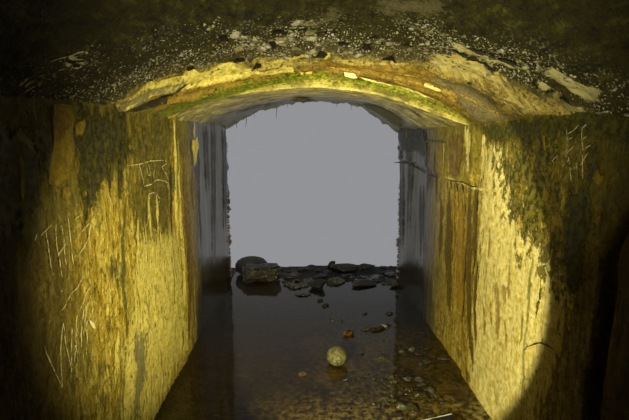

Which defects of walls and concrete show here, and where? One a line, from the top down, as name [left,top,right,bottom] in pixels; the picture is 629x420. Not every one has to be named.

peeling [29,17,629,201]
damp [361,77,441,102]
damp [192,121,216,258]
crack [450,180,478,229]
damp [397,128,576,420]